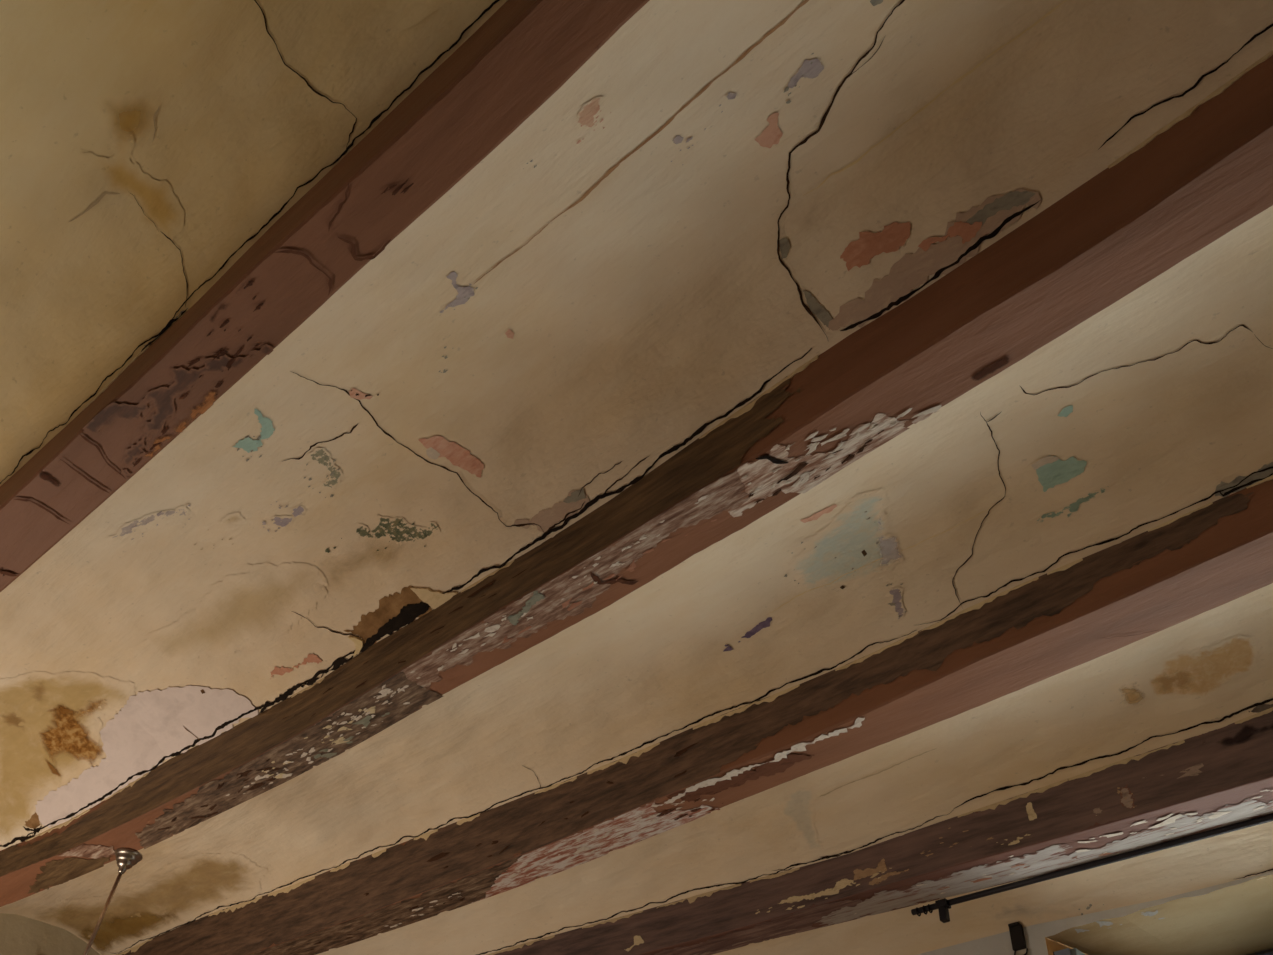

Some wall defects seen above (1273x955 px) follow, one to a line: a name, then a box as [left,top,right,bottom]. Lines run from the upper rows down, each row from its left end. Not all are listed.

crack [1098,24,1273,169]
damp [80,112,185,243]
flaking render [828,188,1041,331]
crack [0,0,912,847]
peeling [972,357,1009,380]
crack [1019,325,1273,395]
peeling [109,504,190,541]
peeling [135,405,941,849]
crack [114,412,1273,955]
damp [1122,634,1260,704]
damp [0,671,136,846]
peeling [654,784,1273,955]